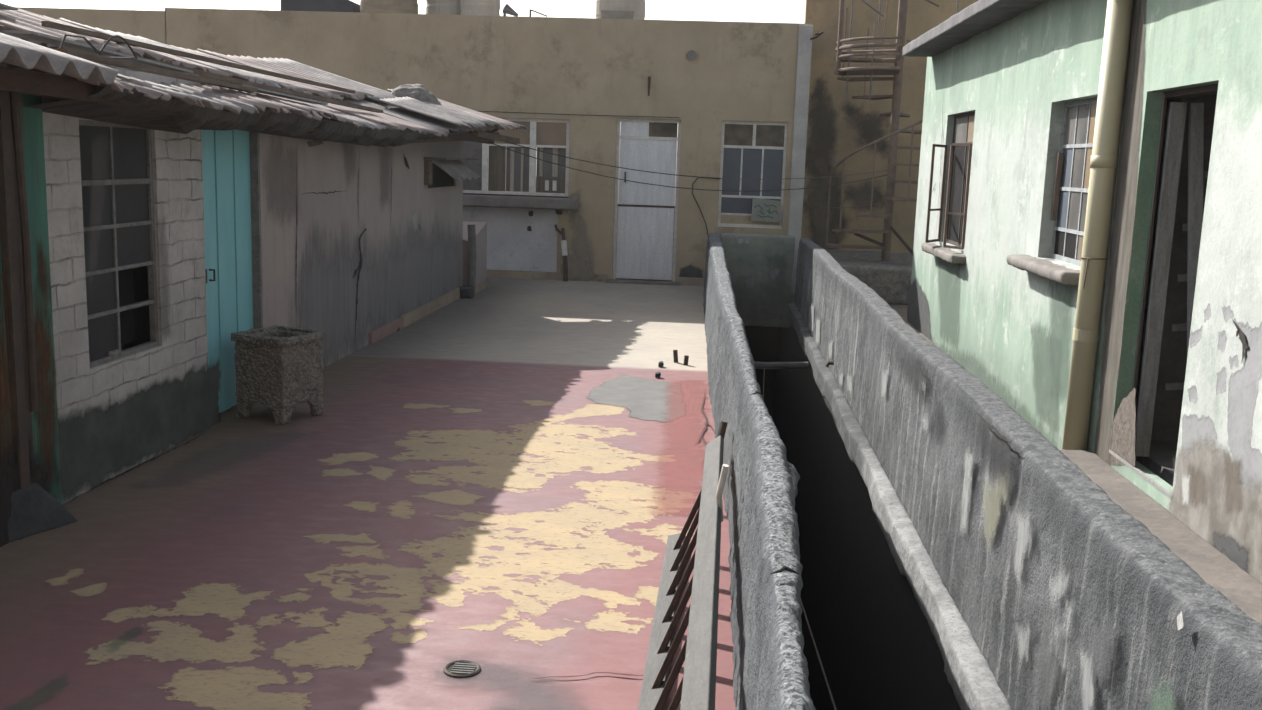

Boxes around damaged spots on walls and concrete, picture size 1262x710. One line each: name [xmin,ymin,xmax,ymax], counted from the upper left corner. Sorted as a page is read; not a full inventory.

crack [296,149,409,338]
corrosion [34,246,56,489]
peeling [45,568,107,597]
water stain [0,361,221,547]
peeling [83,400,697,710]
spalling [1169,303,1262,584]